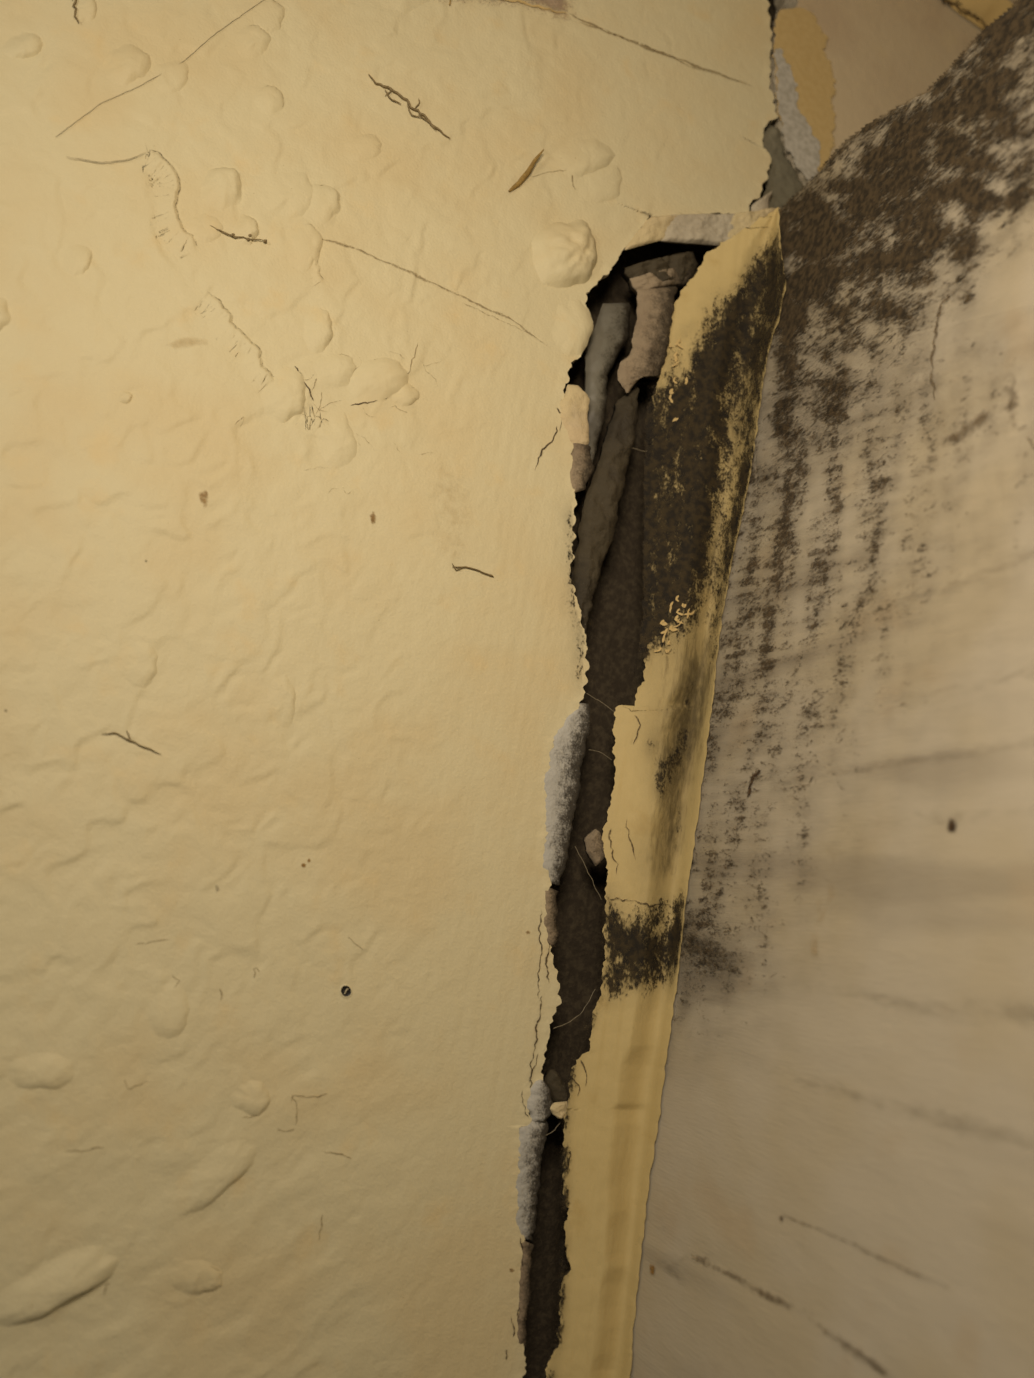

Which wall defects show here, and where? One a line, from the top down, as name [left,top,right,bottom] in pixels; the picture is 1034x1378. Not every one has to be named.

spalling [772,8,836,181]
crack [535,125,805,634]
damp [602,0,1034,1002]
damp [560,1066,576,1211]
crack [506,703,662,1359]